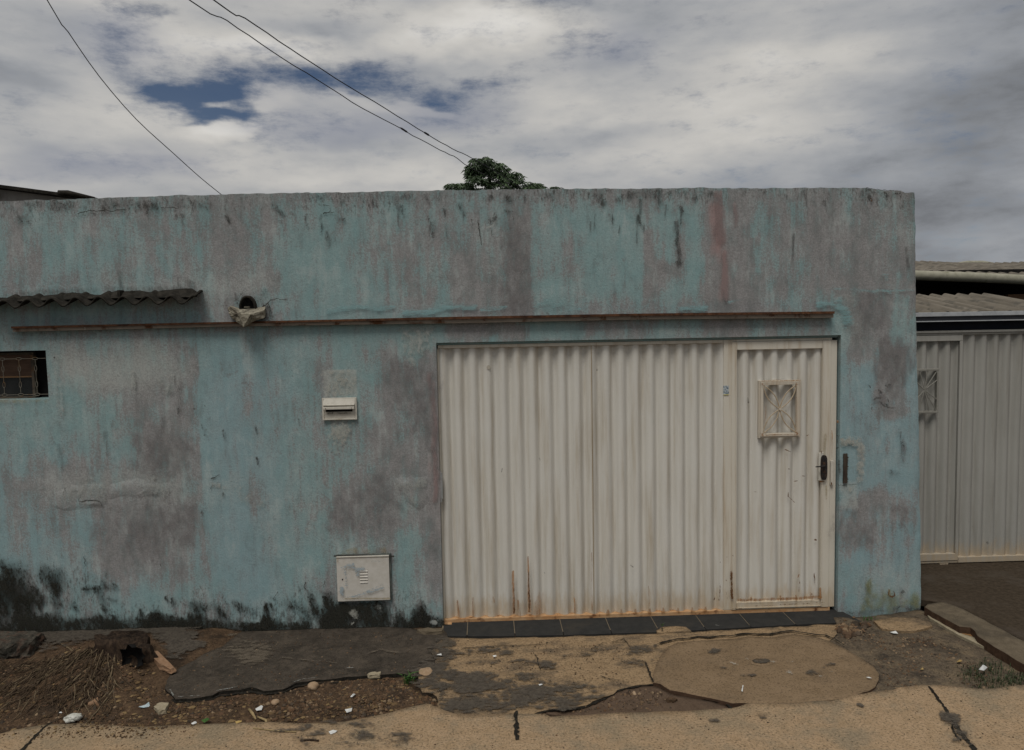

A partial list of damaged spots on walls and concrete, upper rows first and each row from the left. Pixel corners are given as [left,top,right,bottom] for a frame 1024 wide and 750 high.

leakage [0,559,447,663]
rust [512,558,541,615]
rust [678,572,822,612]
crack [513,627,844,740]
crack [928,686,977,750]